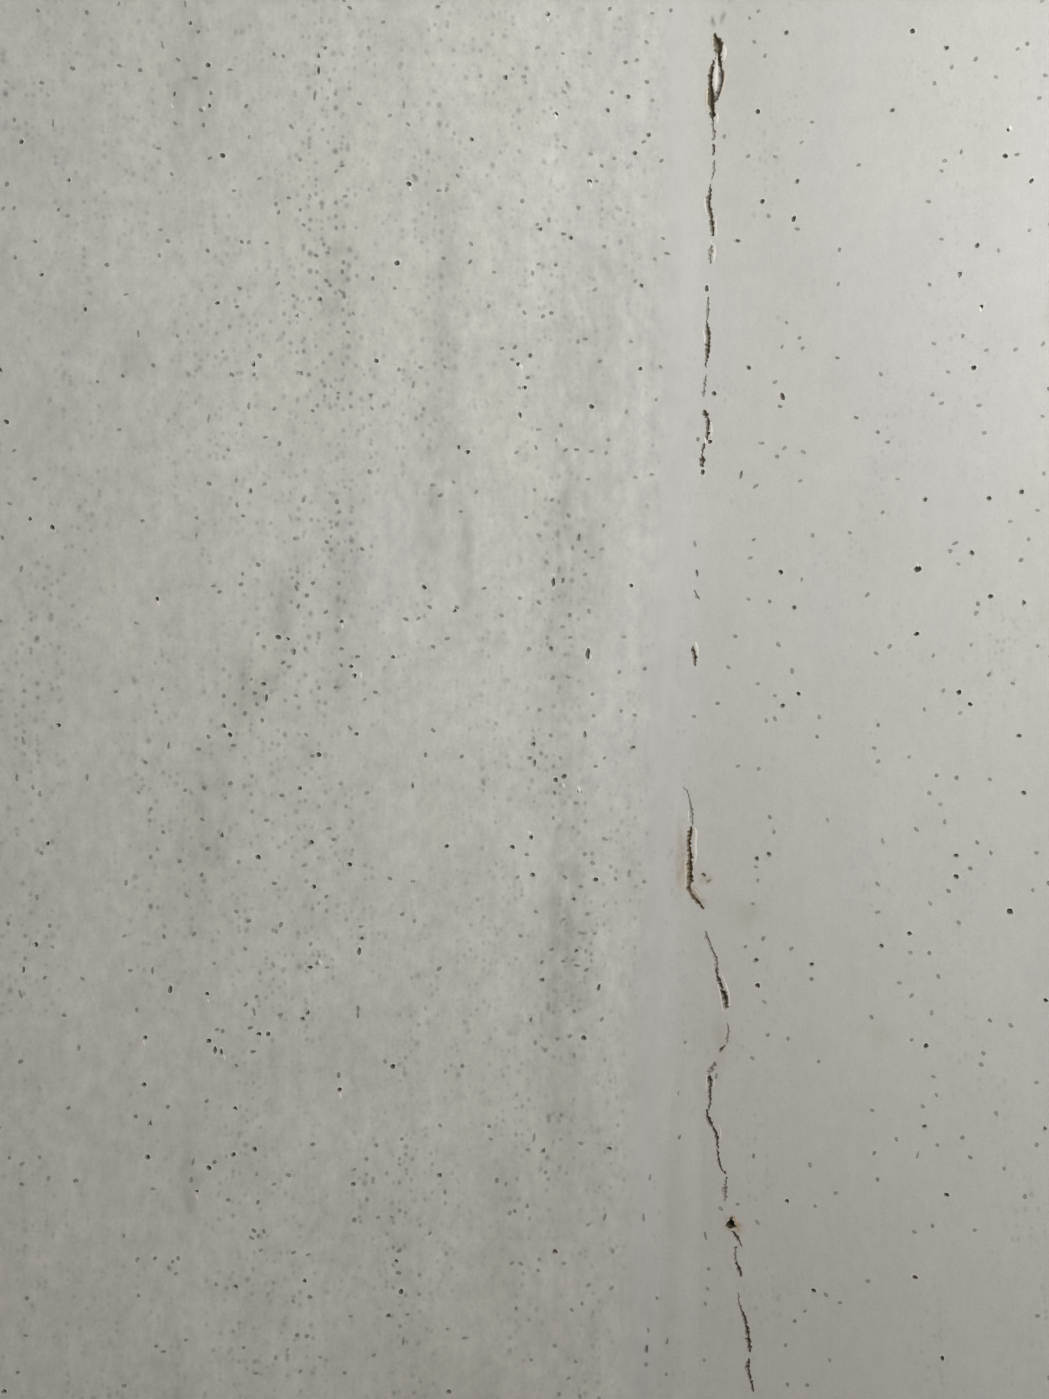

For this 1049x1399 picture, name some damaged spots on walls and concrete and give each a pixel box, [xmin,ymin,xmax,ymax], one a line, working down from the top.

crack [704,120,717,263]
crack [699,298,713,467]
crack [690,642,699,666]
crack [683,787,754,1391]